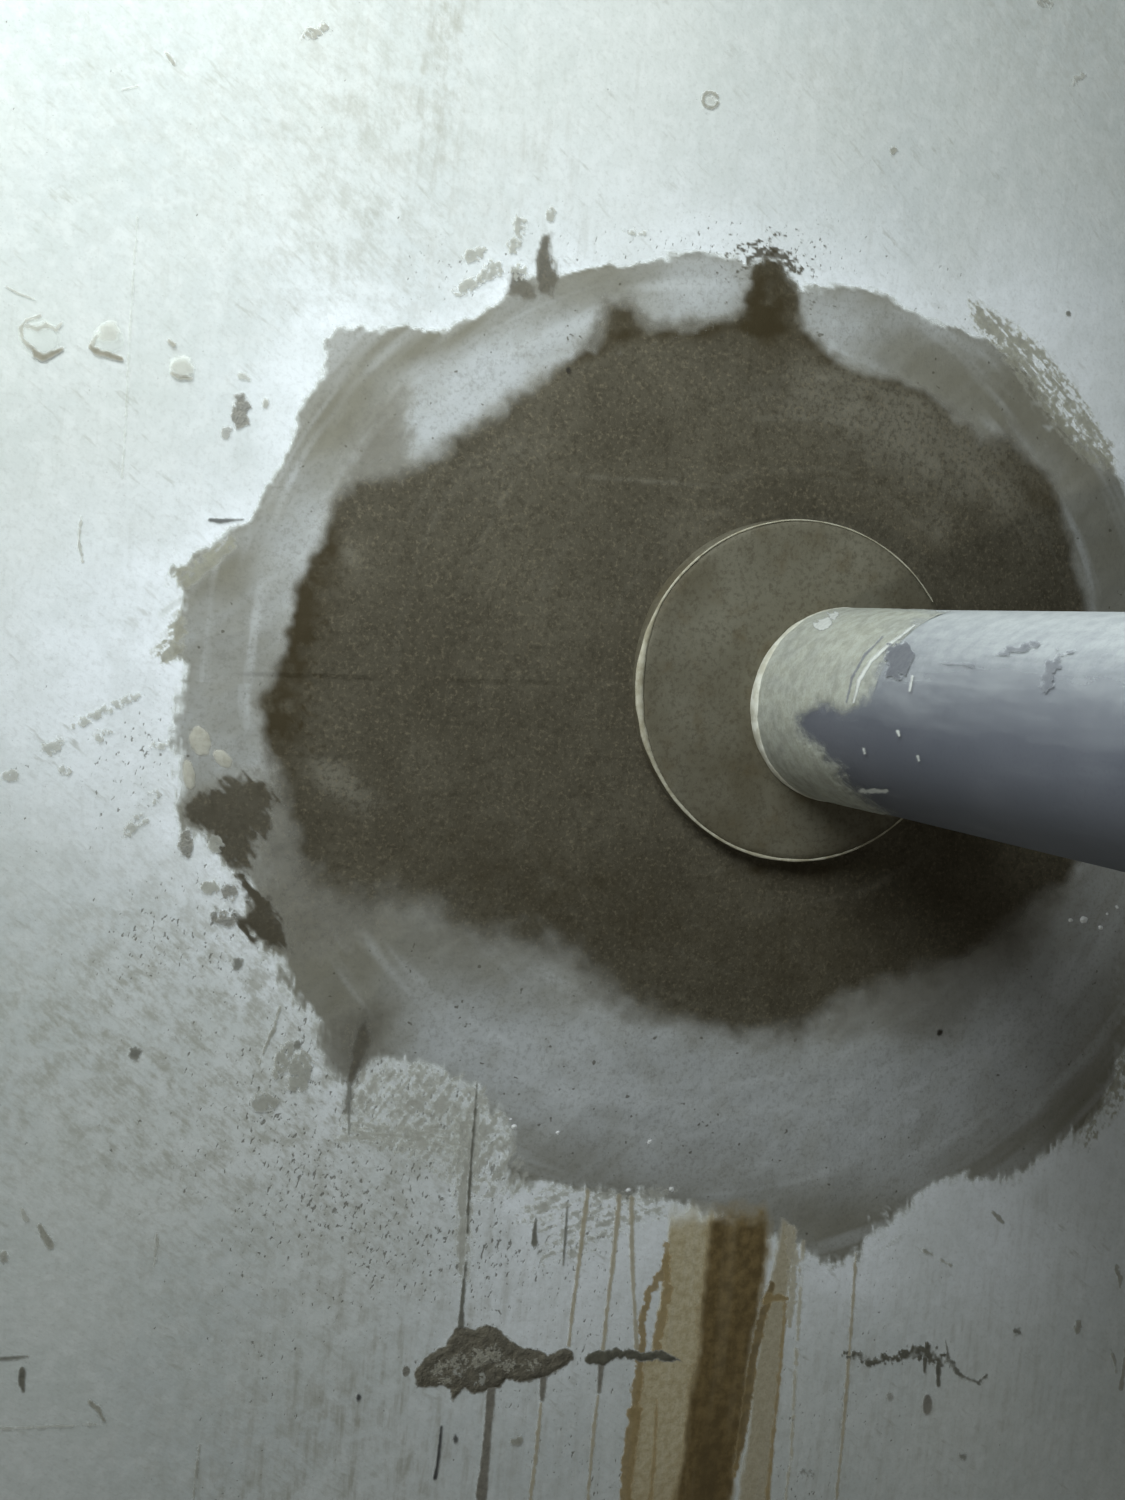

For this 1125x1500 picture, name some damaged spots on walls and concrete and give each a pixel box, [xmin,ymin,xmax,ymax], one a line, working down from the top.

peeling [454,215,528,295]
peeling [222,374,268,438]
leakage [183,227,1088,1037]
peeling [177,829,224,858]
peeling [200,880,238,927]
peeling [251,1040,314,1112]
corrosion [567,1189,590,1347]
corrosion [601,1194,805,1500]
crack [841,1341,988,1415]